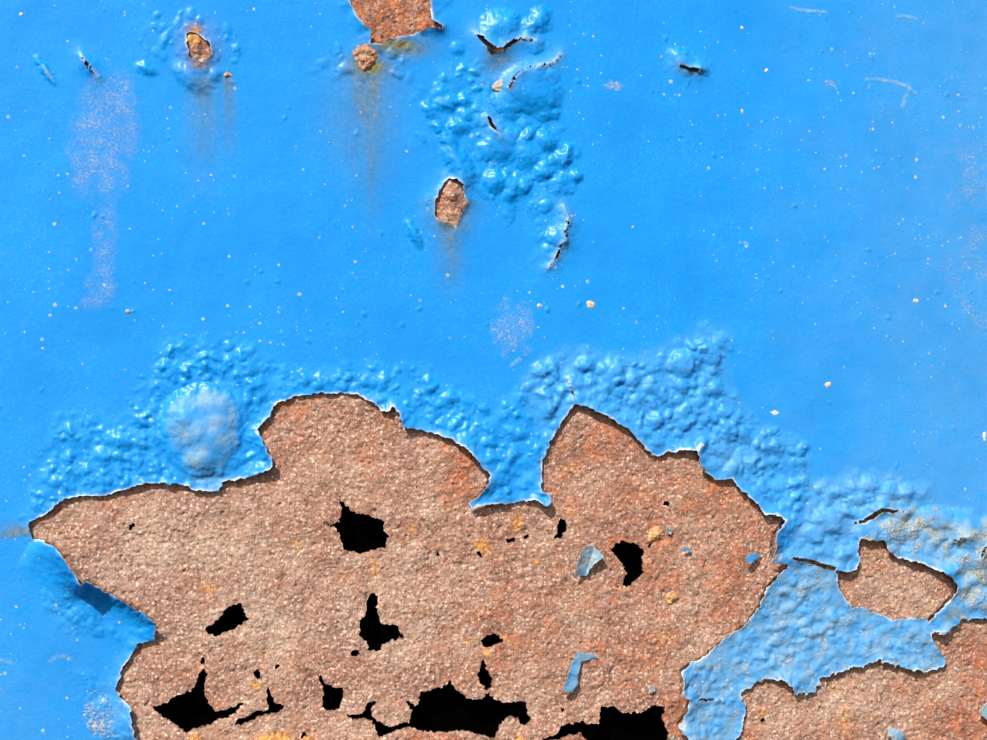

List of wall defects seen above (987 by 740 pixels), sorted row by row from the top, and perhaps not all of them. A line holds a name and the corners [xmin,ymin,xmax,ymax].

peeling [179,23,219,71]
peeling [339,0,454,56]
crack [466,24,567,142]
crack [671,55,706,79]
peeling [426,169,476,239]
crack [541,199,573,274]
peeling [15,380,987,740]